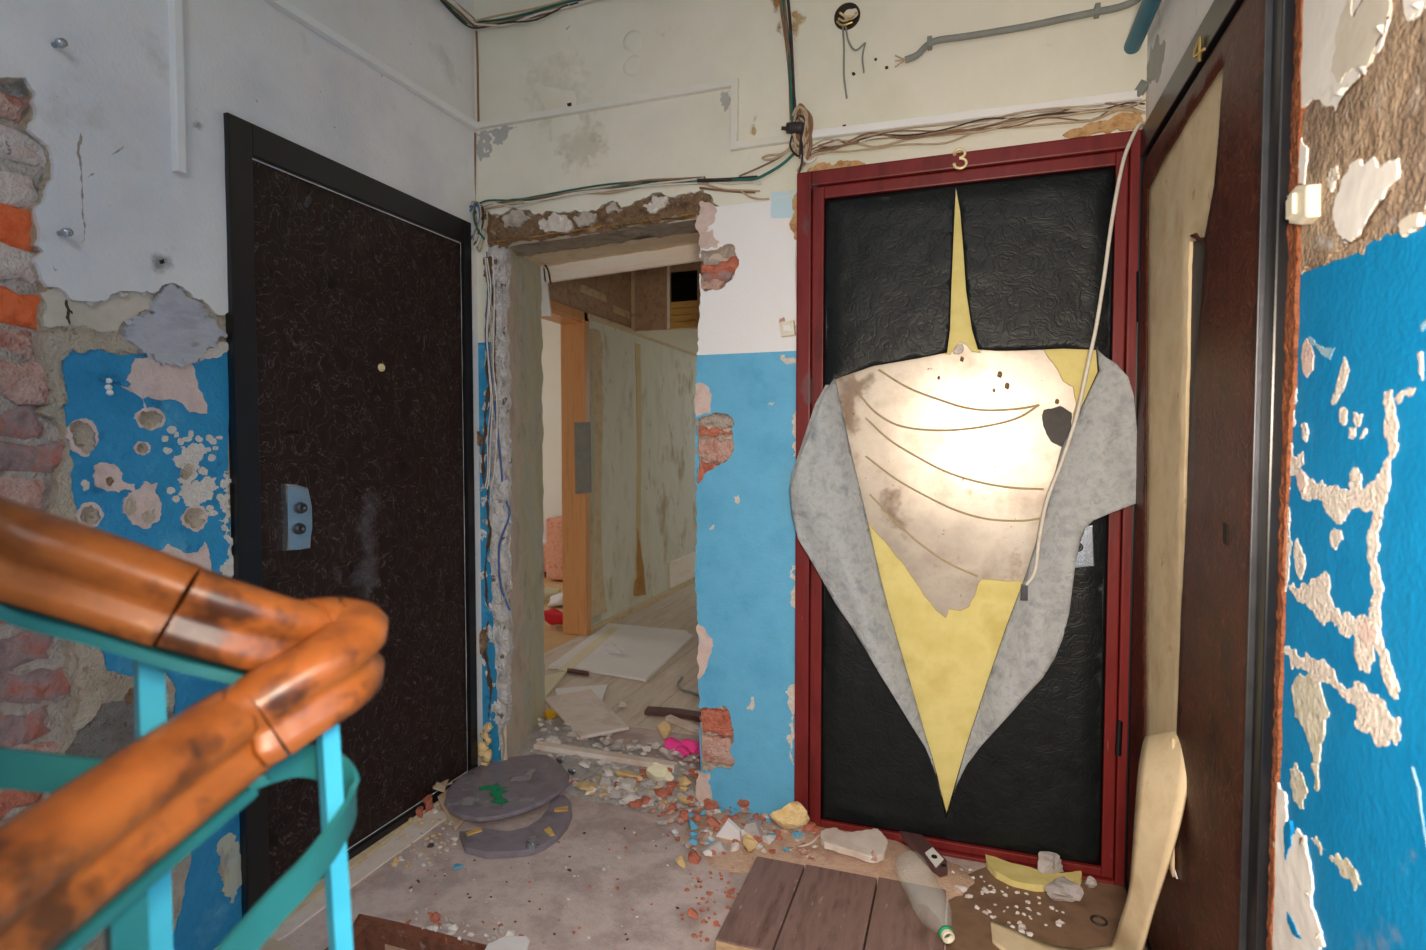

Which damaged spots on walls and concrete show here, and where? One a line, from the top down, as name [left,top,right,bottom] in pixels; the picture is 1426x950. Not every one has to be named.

spalling [1298,0,1426,275]
flaking render [0,81,234,577]
spalling [477,191,739,751]
flaking render [0,789,49,824]
flaking render [0,620,135,758]
spalling [696,706,735,808]
peeling [1272,336,1424,950]